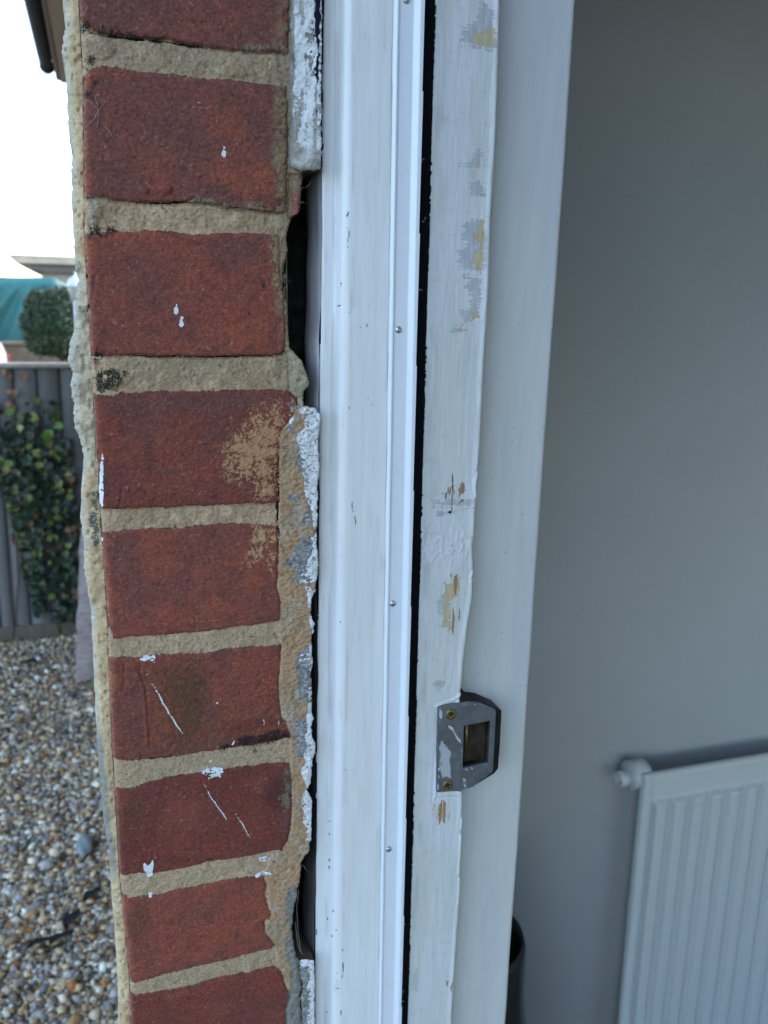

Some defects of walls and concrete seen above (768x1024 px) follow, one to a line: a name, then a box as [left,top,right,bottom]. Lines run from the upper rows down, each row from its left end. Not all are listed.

peeling [459,0,498,53]
peeling [292,0,322,151]
peeling [458,148,486,199]
peeling [450,218,490,333]
peeling [430,474,475,517]
peeling [284,407,321,842]
peeling [437,573,460,633]